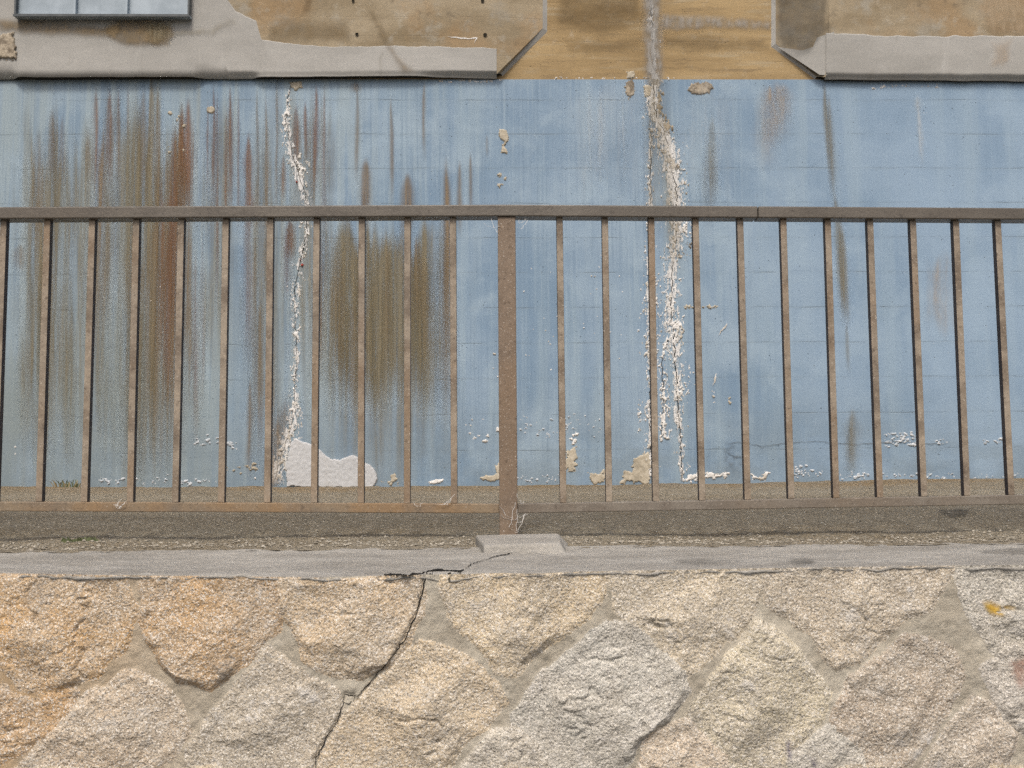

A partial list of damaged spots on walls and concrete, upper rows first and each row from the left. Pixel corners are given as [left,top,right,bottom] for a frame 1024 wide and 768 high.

spalling [0,32,17,61]
corrosion [174,111,190,206]
peeling [285,438,399,487]
peeling [620,452,651,485]
crack [315,553,510,768]